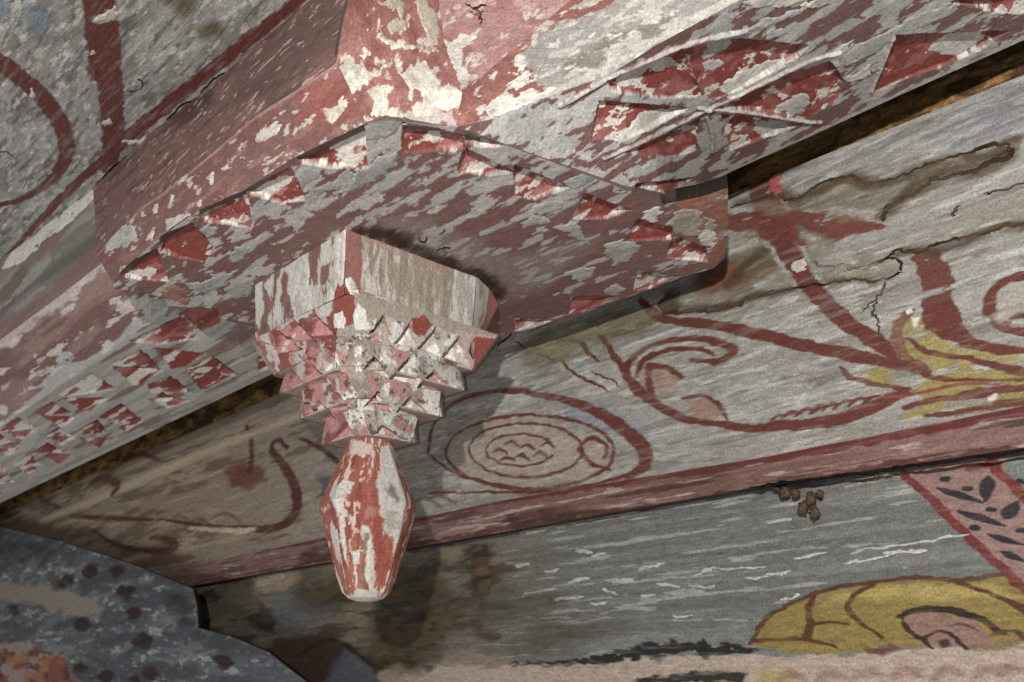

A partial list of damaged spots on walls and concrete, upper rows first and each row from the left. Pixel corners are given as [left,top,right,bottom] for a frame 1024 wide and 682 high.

peeling [304,0,482,124]
peeling [486,47,555,118]
peeling [722,59,790,100]
peeling [701,0,839,71]
peeling [829,0,960,82]
peeling [983,0,1024,18]
peeling [255,121,282,143]
peeling [618,106,692,144]
water stain [736,136,1022,217]
peeling [105,194,202,252]
peeling [641,206,718,250]
crack [657,205,1024,334]